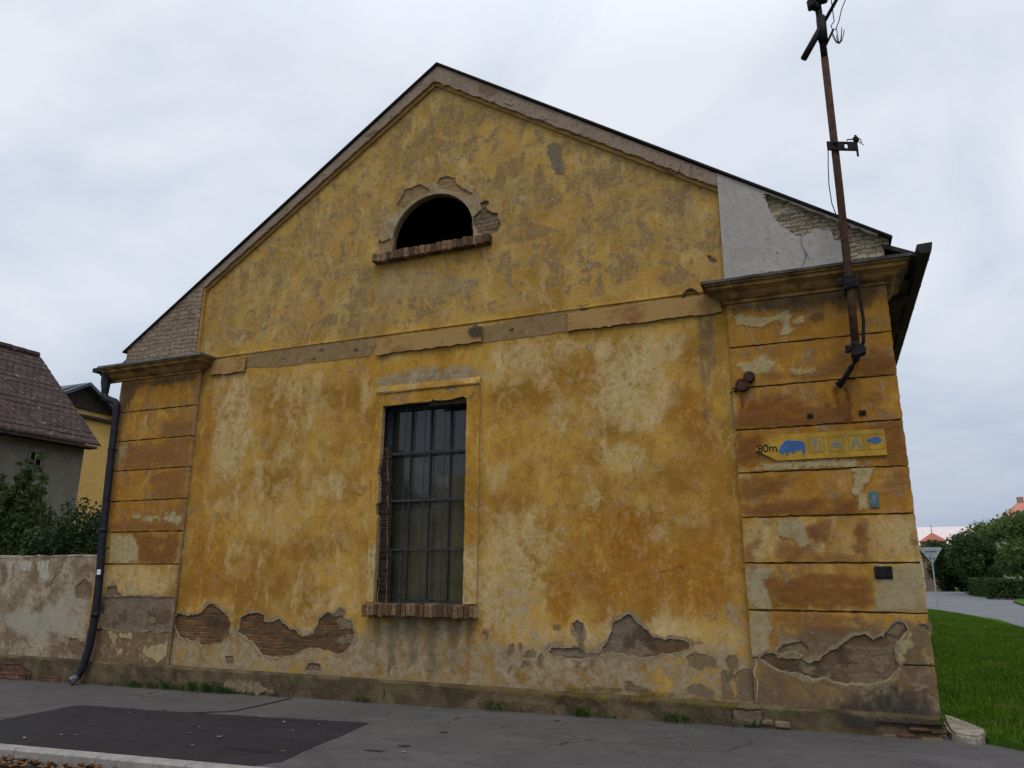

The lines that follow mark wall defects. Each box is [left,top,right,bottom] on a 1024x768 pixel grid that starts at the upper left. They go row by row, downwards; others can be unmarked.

spalling [396,176,501,234]
spalling [763,195,889,260]
peeling [734,308,805,335]
peeling [738,434,874,510]
flaking render [376,447,393,603]
peeling [776,519,868,561]
spalling [4,578,358,674]
spalling [506,539,933,701]